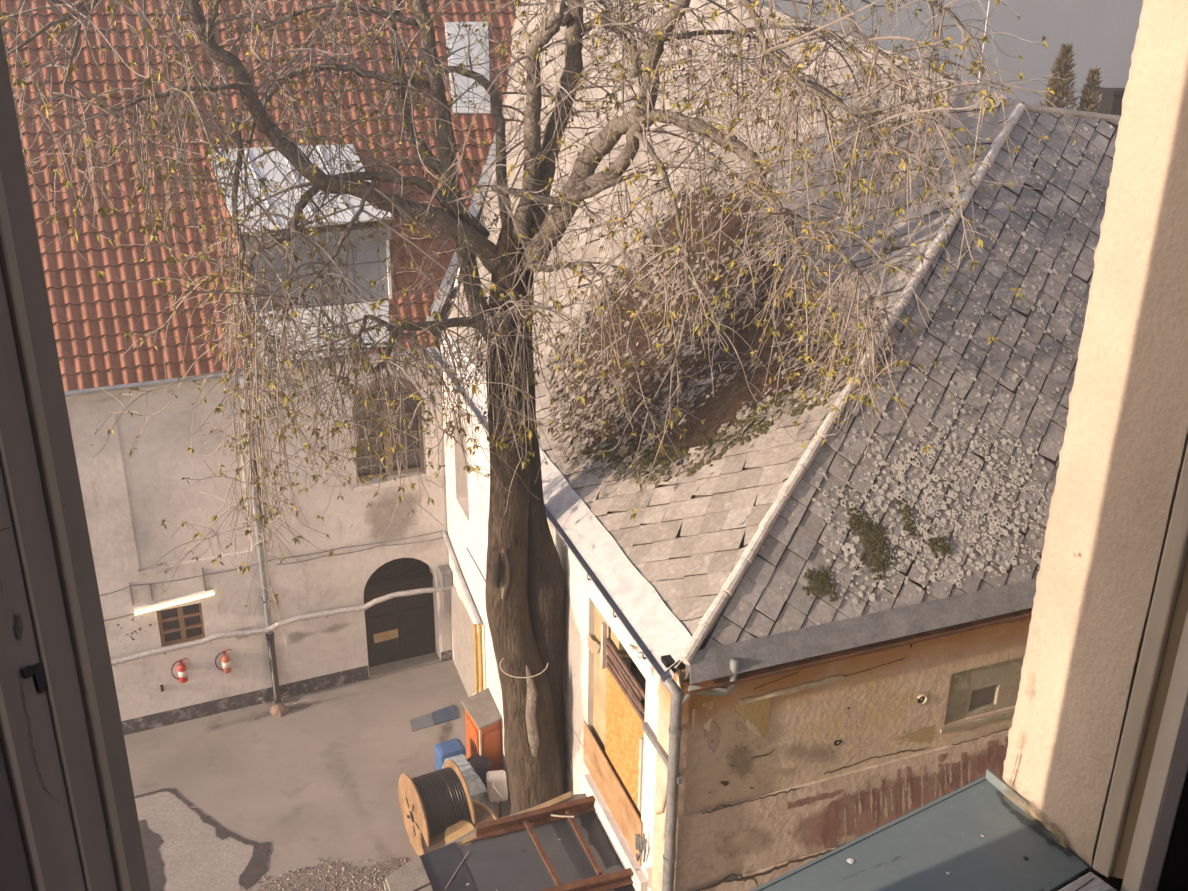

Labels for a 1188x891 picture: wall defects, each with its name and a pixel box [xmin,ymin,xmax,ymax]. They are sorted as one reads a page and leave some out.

peeling [691,699,783,774]
crack [702,728,1019,815]
water stain [788,737,1066,848]
crack [693,843,847,891]